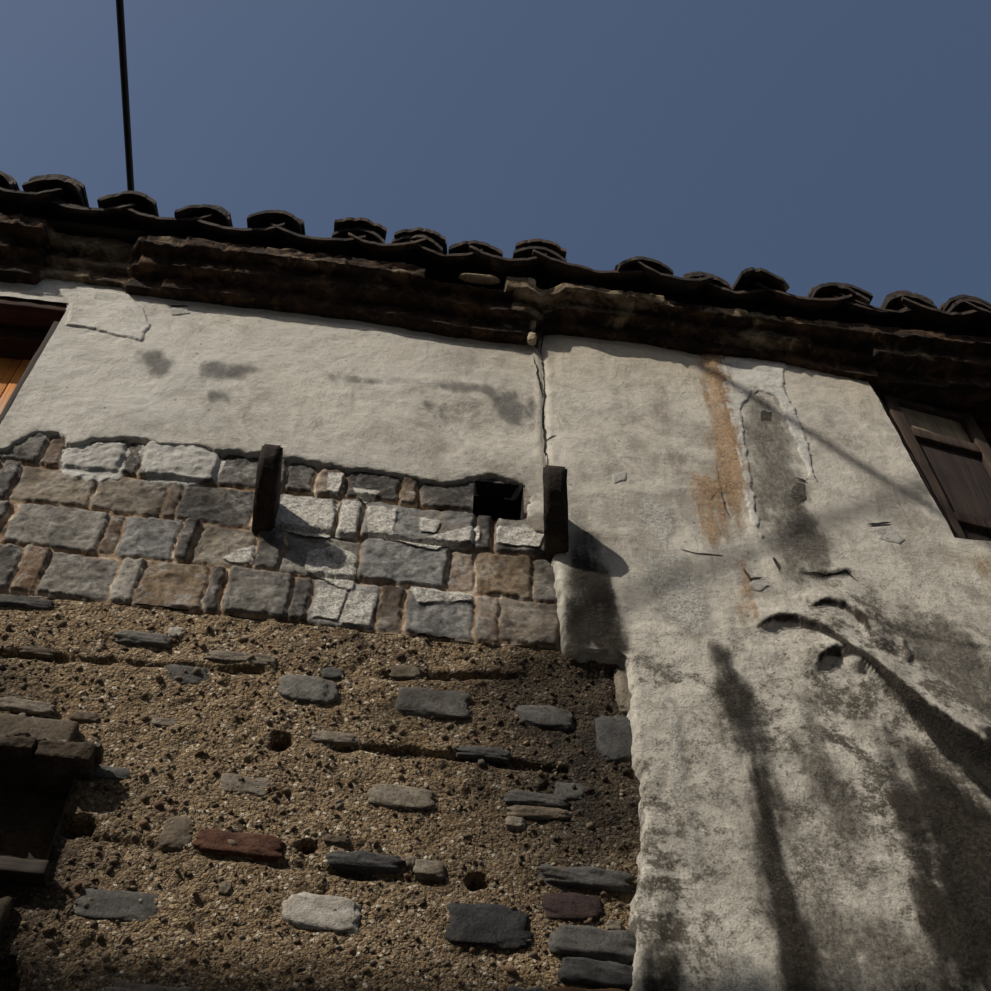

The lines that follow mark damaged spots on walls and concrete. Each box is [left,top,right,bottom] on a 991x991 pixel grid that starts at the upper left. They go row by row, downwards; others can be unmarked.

flaking render [0,432,561,651]
crack [533,335,556,465]
leakage [565,532,628,654]
corrosion [691,354,746,544]
leakage [745,400,829,583]
leakage [710,599,991,991]
leakage [643,932,684,991]